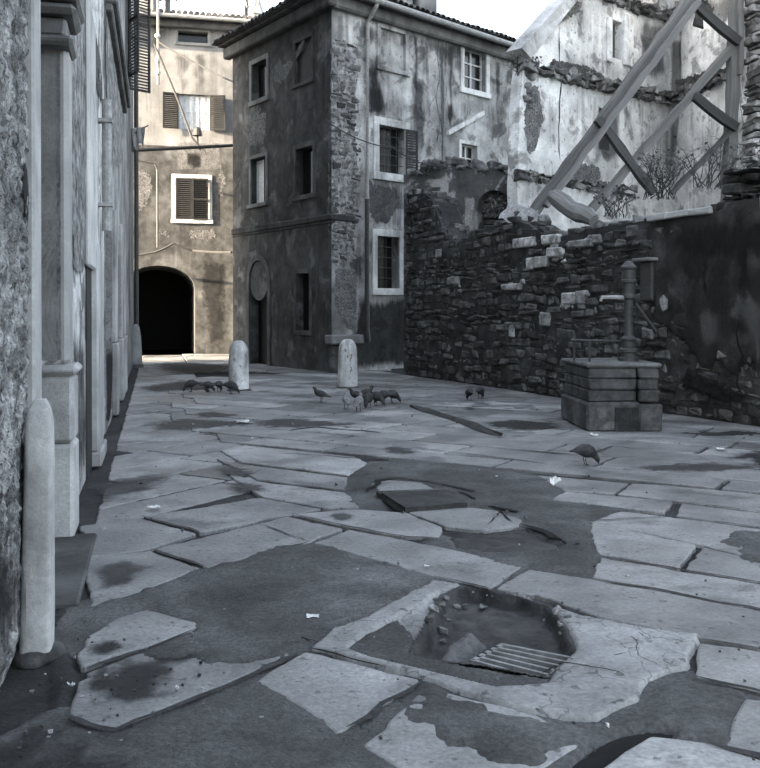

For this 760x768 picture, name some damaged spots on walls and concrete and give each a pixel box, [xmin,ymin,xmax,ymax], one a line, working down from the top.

spalling [327,39,398,272]
peeling [524,85,545,154]
damp [678,221,760,361]
crack [542,661,632,674]